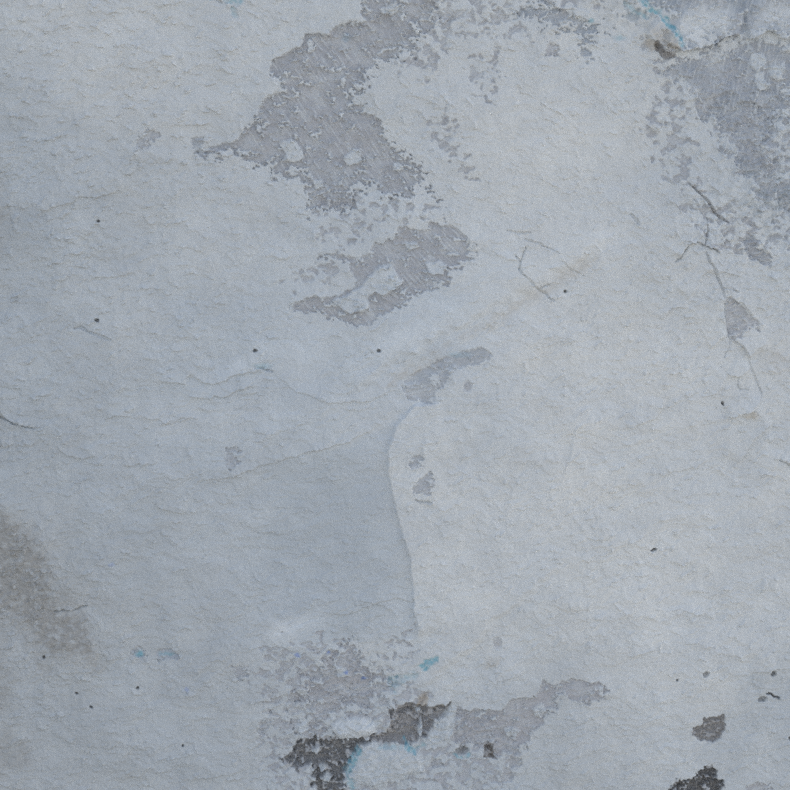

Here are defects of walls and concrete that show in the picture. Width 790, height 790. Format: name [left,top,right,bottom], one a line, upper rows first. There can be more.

peeling [191,0,439,216]
peeling [648,0,790,211]
peeling [289,222,475,329]
crack [675,183,762,419]
peeling [278,639,608,790]
flaking render [668,765,724,790]
flaking render [692,714,726,742]